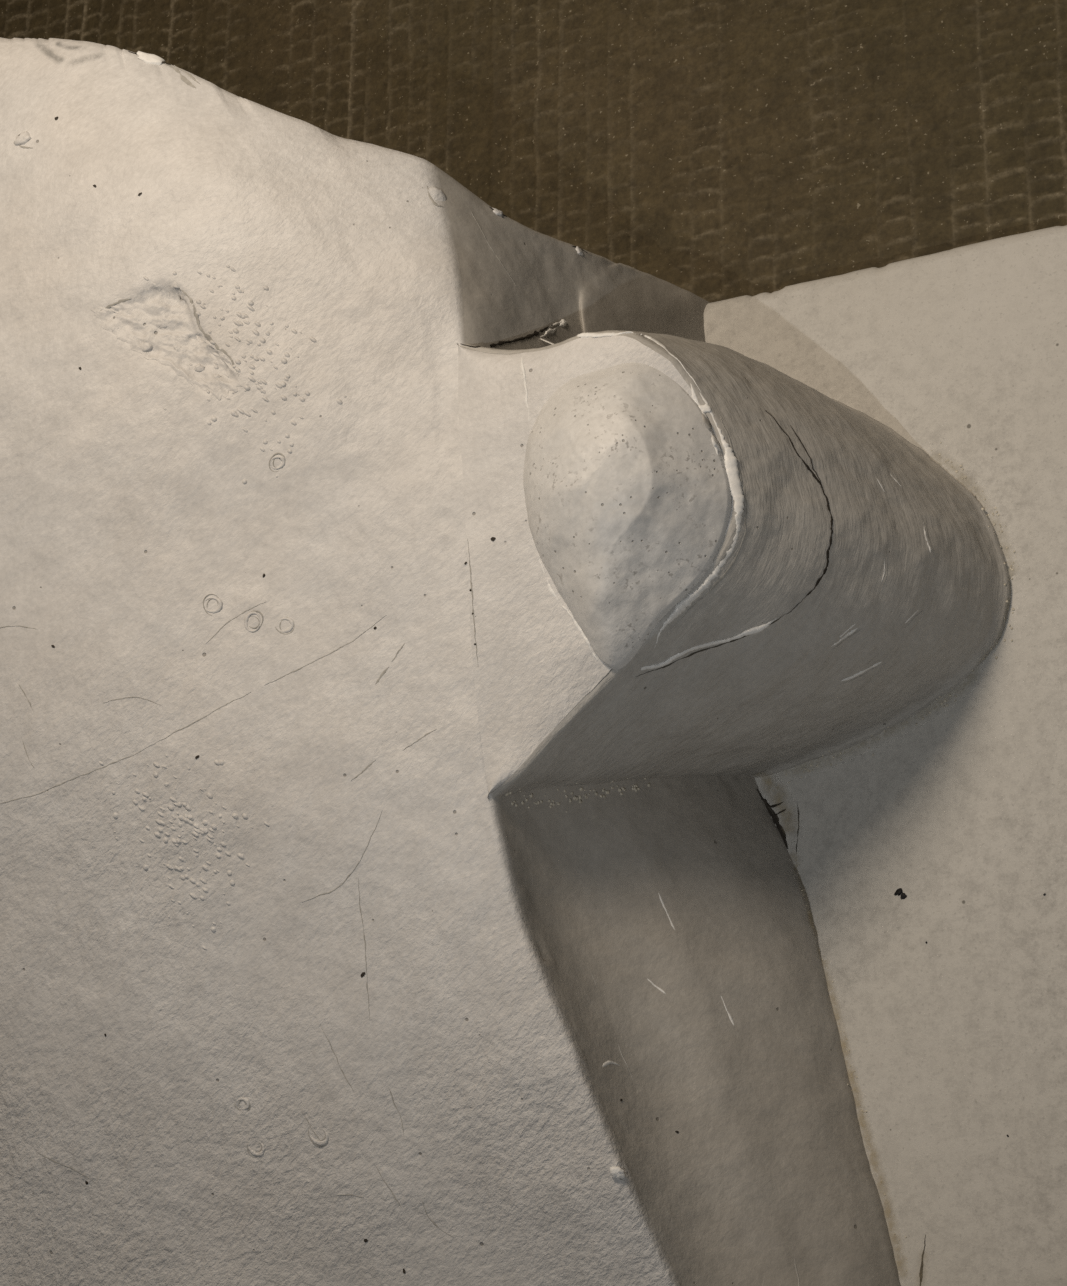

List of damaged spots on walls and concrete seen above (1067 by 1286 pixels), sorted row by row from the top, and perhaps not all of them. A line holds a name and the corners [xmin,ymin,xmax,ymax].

peeling [460,319,747,648]